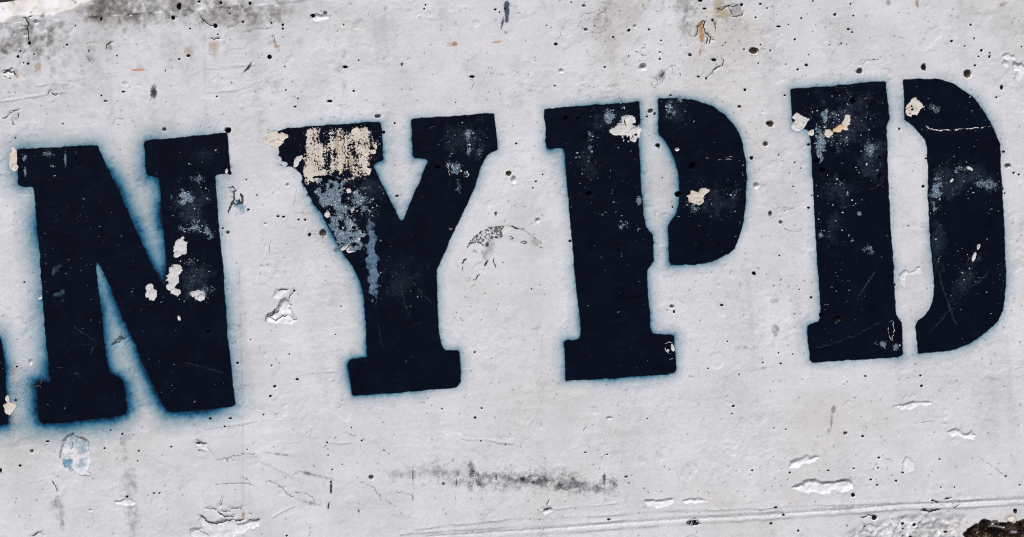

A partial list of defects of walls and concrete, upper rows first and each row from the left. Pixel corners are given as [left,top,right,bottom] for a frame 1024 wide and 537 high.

peeling [791,99,856,146]
peeling [906,97,923,119]
peeling [294,115,396,198]
peeling [672,188,710,208]
peeling [145,236,205,301]
spalling [266,288,297,328]
spalling [893,401,932,410]
spalling [947,428,976,440]
spalling [46,433,91,476]
spalling [789,455,855,497]
spalling [843,509,1024,537]